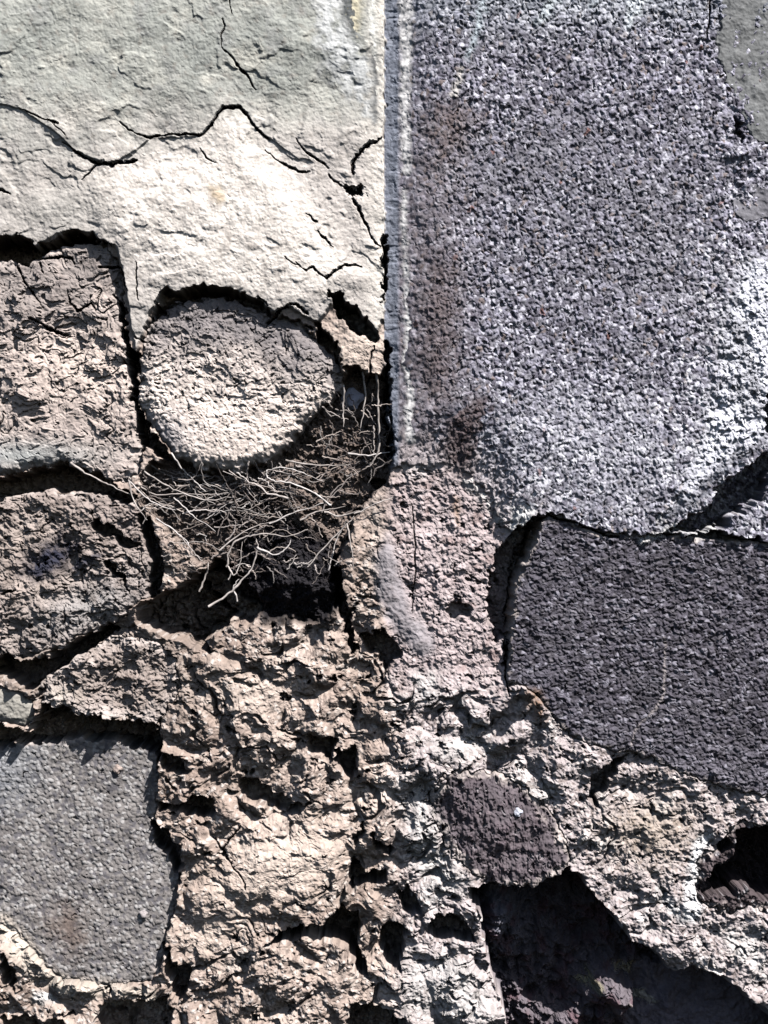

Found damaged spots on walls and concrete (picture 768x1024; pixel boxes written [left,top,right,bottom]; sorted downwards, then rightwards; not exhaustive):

crack [20,0,382,247]
crack [16,240,146,343]
crack [258,297,313,330]
crack [285,214,362,280]
crack [546,513,619,538]
spalling [468,866,768,1024]